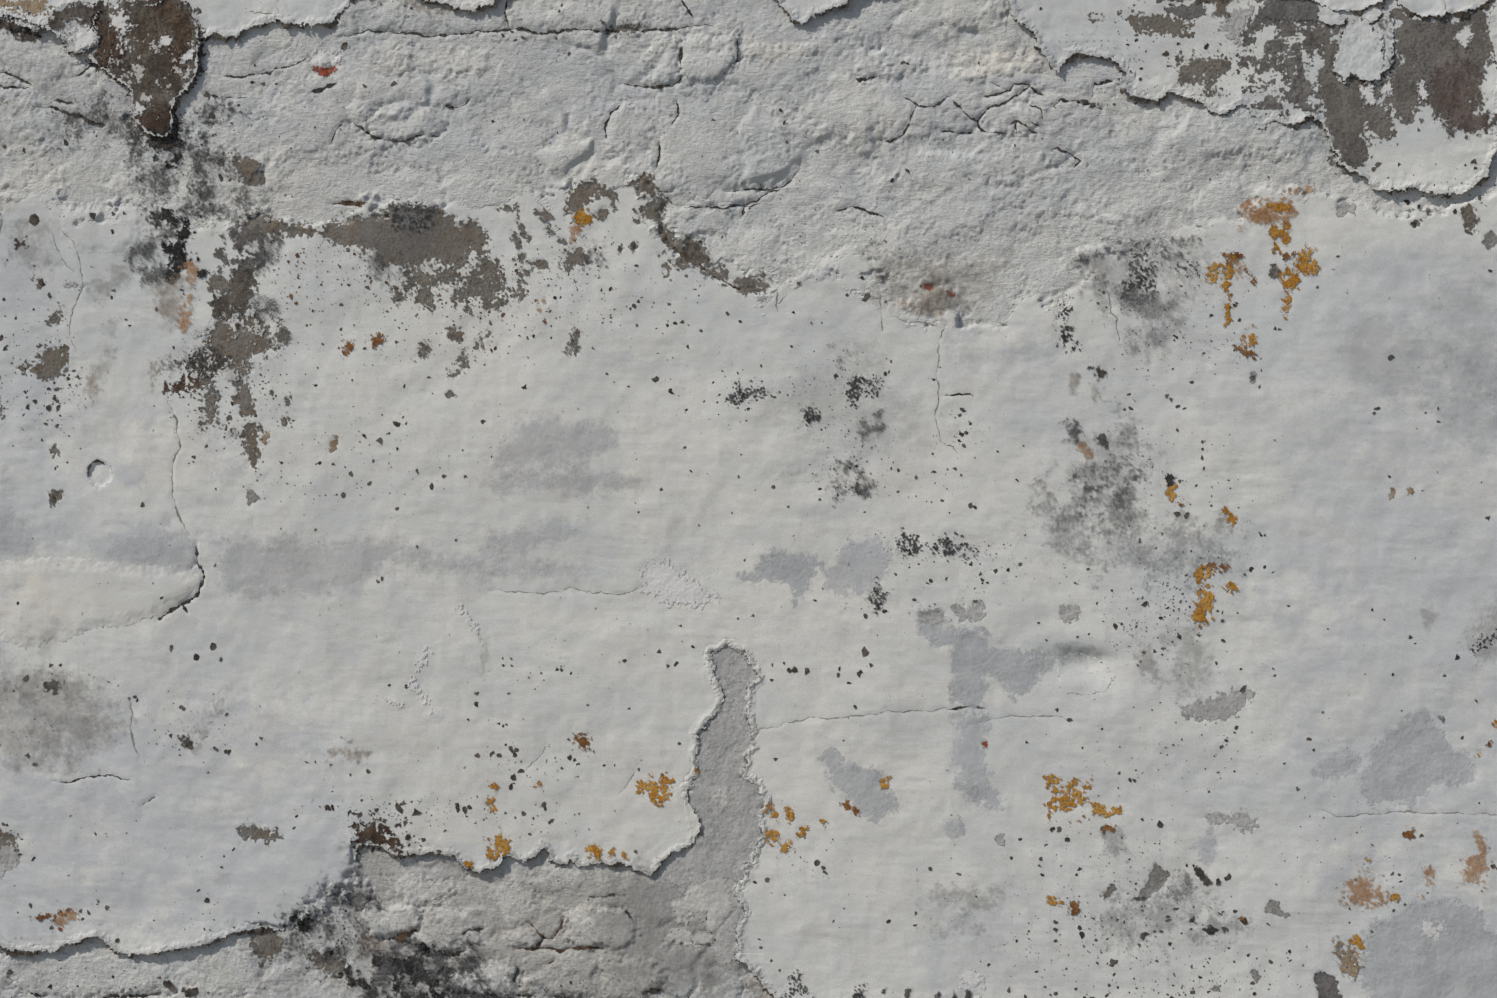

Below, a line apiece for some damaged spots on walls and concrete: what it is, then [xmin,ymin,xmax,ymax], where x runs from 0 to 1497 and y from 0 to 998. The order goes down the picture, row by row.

damp [50,90,265,301]
crack [209,58,337,98]
crack [331,0,800,311]
crack [855,76,1112,168]
spalling [0,0,1497,507]
rust [1204,185,1320,327]
damp [725,380,773,408]
rust [1186,562,1238,630]
spalling [0,639,988,998]
rust [635,773,674,807]
rust [1038,773,1124,834]
peeling [1314,971,1342,998]